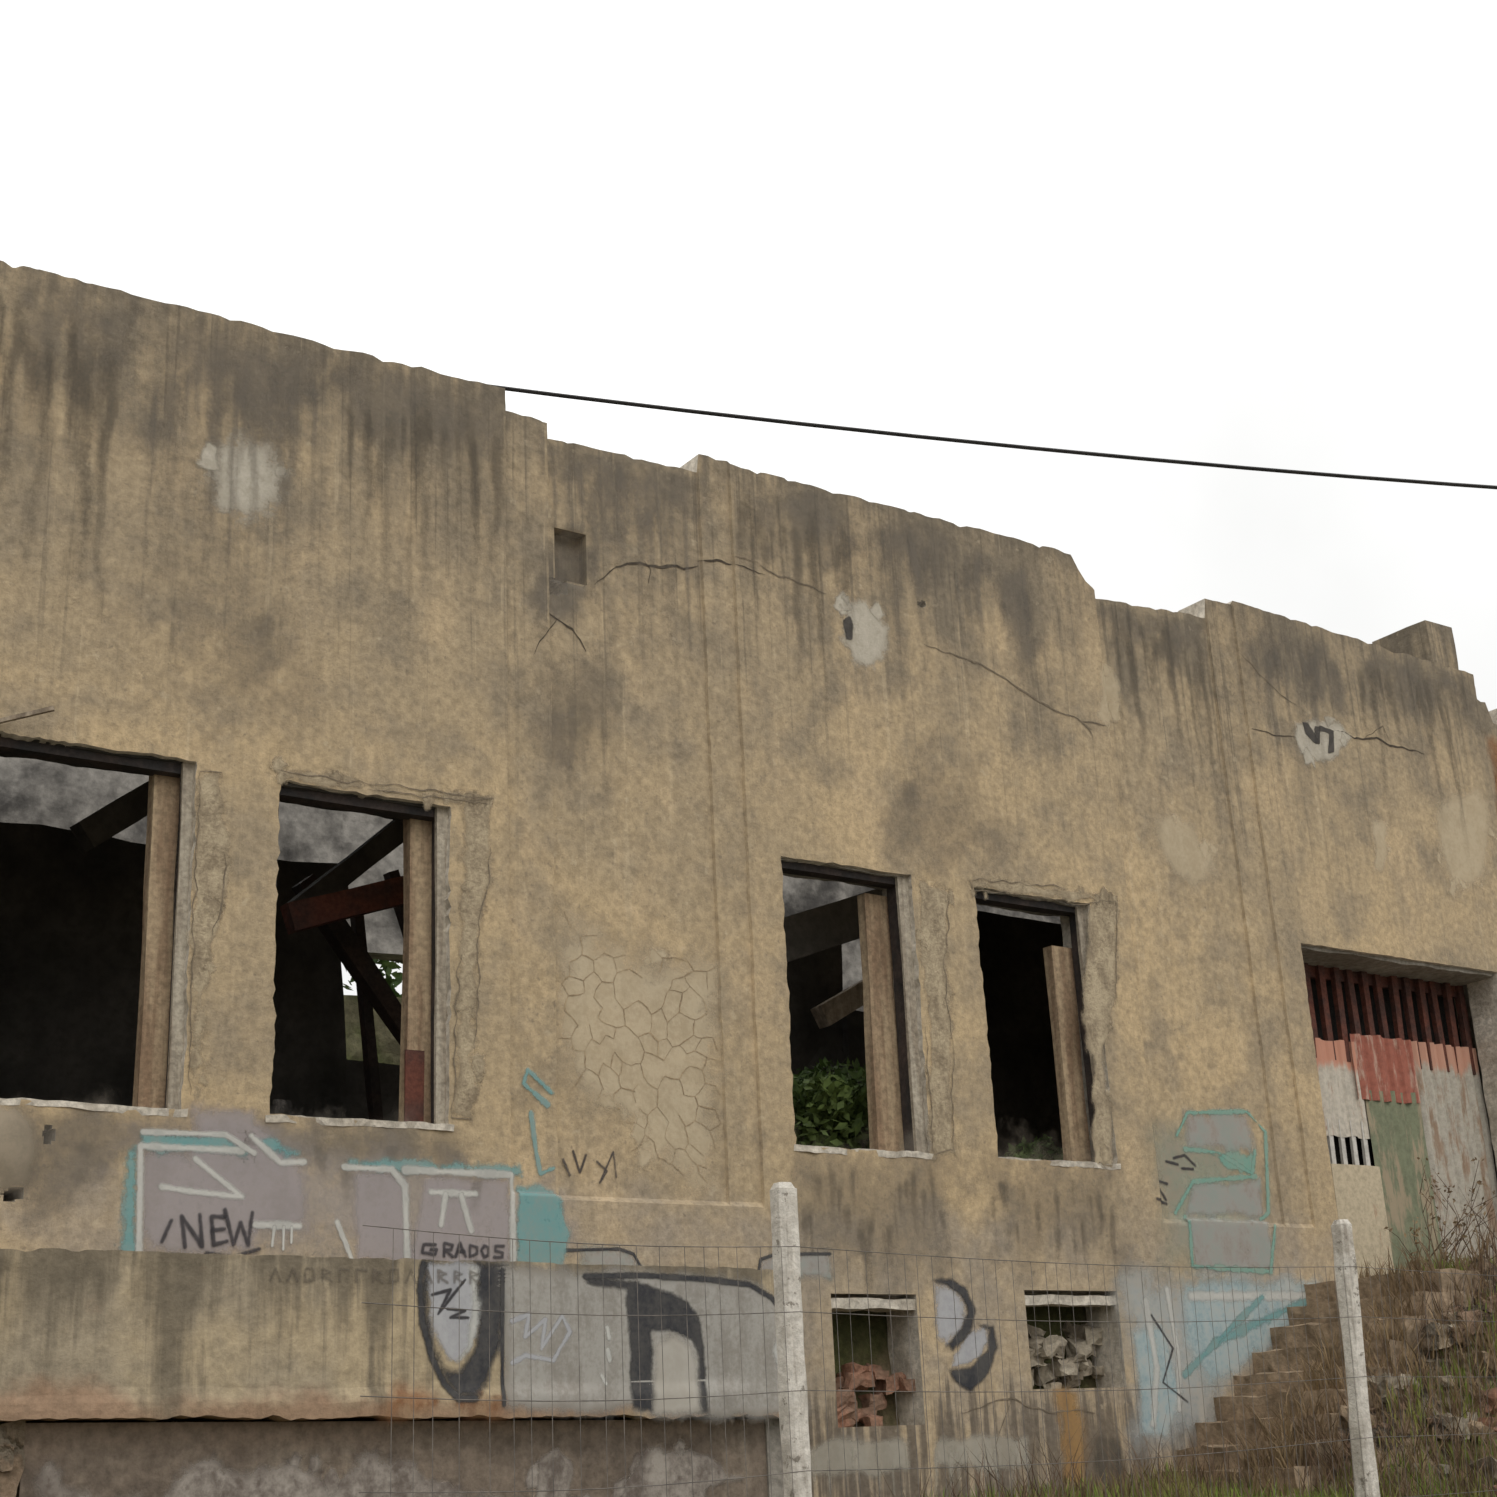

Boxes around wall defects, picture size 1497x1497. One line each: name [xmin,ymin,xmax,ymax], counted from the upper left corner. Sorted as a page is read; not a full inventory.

spalling [197,432,289,525]
crack [594,556,826,594]
crack [534,613,586,654]
spalling [834,592,889,666]
crack [924,644,1107,736]
spalling [1295,717,1351,767]
crack [559,912,721,1183]